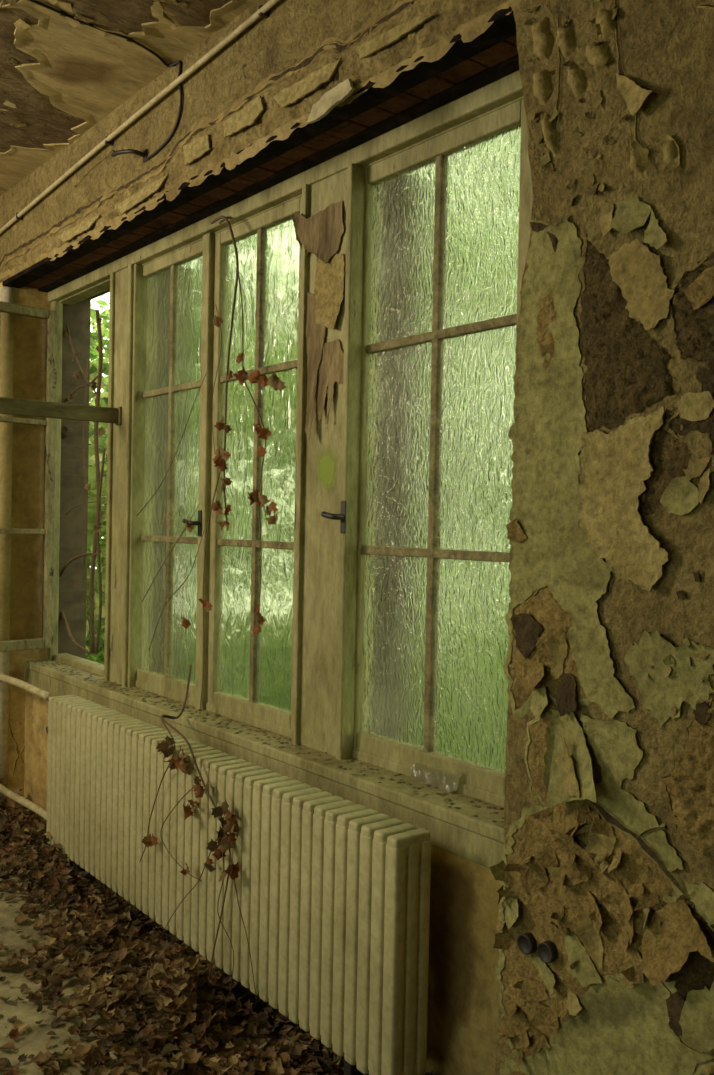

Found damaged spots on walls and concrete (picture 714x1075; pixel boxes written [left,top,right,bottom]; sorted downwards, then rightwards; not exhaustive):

flaking render [0,0,522,280]
peeling [615,73,657,116]
flaking render [490,196,714,1075]
leakage [429,864,472,1031]